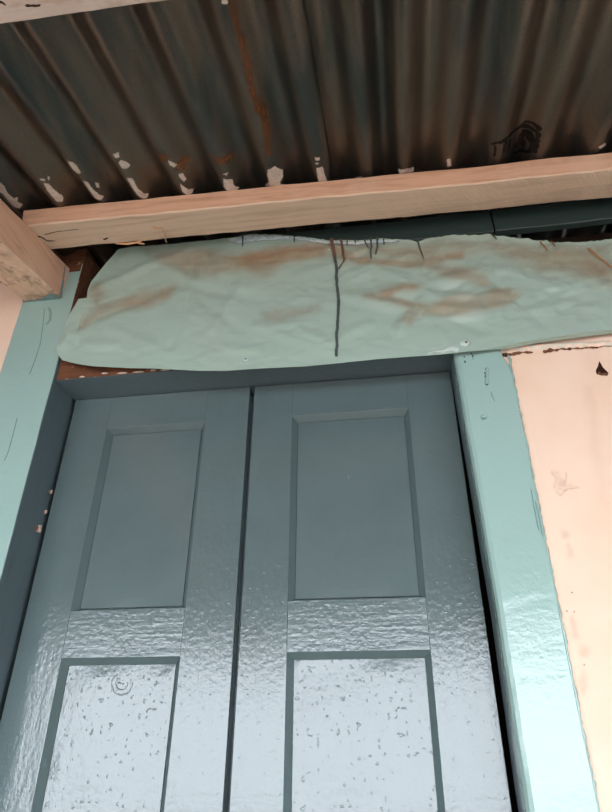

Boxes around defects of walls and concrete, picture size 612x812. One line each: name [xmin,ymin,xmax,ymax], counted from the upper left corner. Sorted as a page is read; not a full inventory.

peeling [0,183,23,209]
peeling [40,176,63,202]
peeling [68,161,104,200]
peeling [113,152,149,199]
peeling [168,160,194,195]
peeling [223,172,239,191]
peeling [265,166,286,187]
peeling [314,157,327,182]
damp [329,237,385,357]